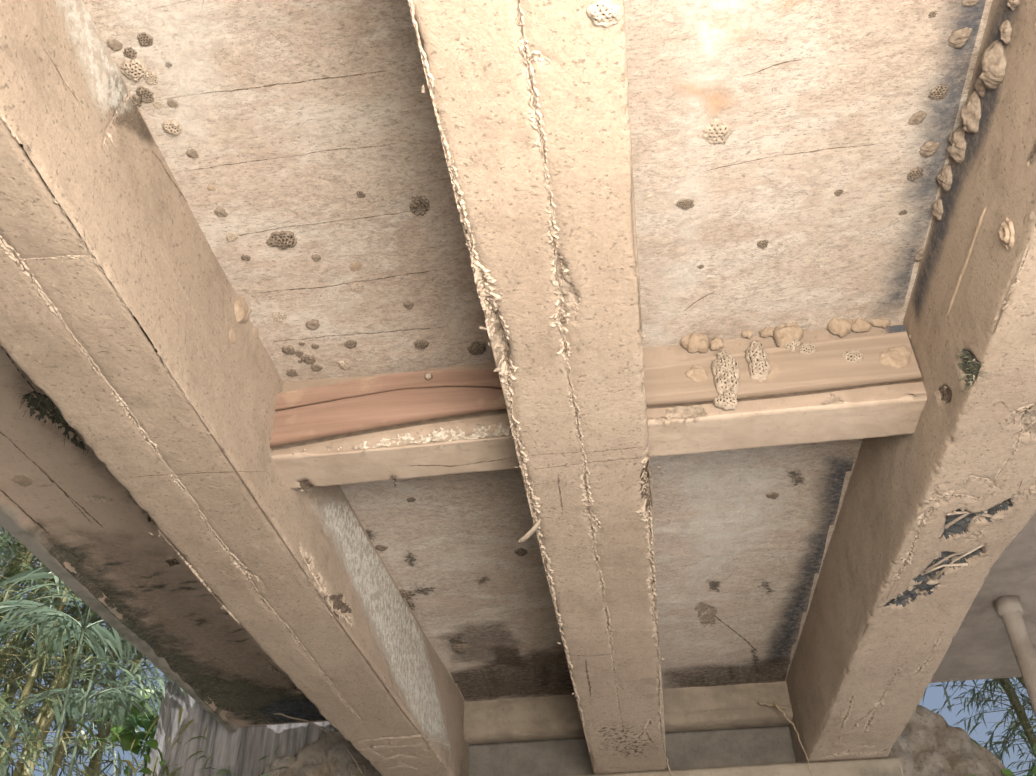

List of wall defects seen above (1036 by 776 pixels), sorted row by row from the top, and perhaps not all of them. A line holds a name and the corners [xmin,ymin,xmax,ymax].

damp [989,0,1012,46]
damp [894,0,995,311]
damp [49,544,326,725]
crack [0,235,437,768]
spalling [0,111,448,771]
crack [410,0,654,741]
spalling [882,497,1016,611]
spalling [934,347,992,403]
crack [920,382,1036,524]
spalling [1018,405,1036,442]